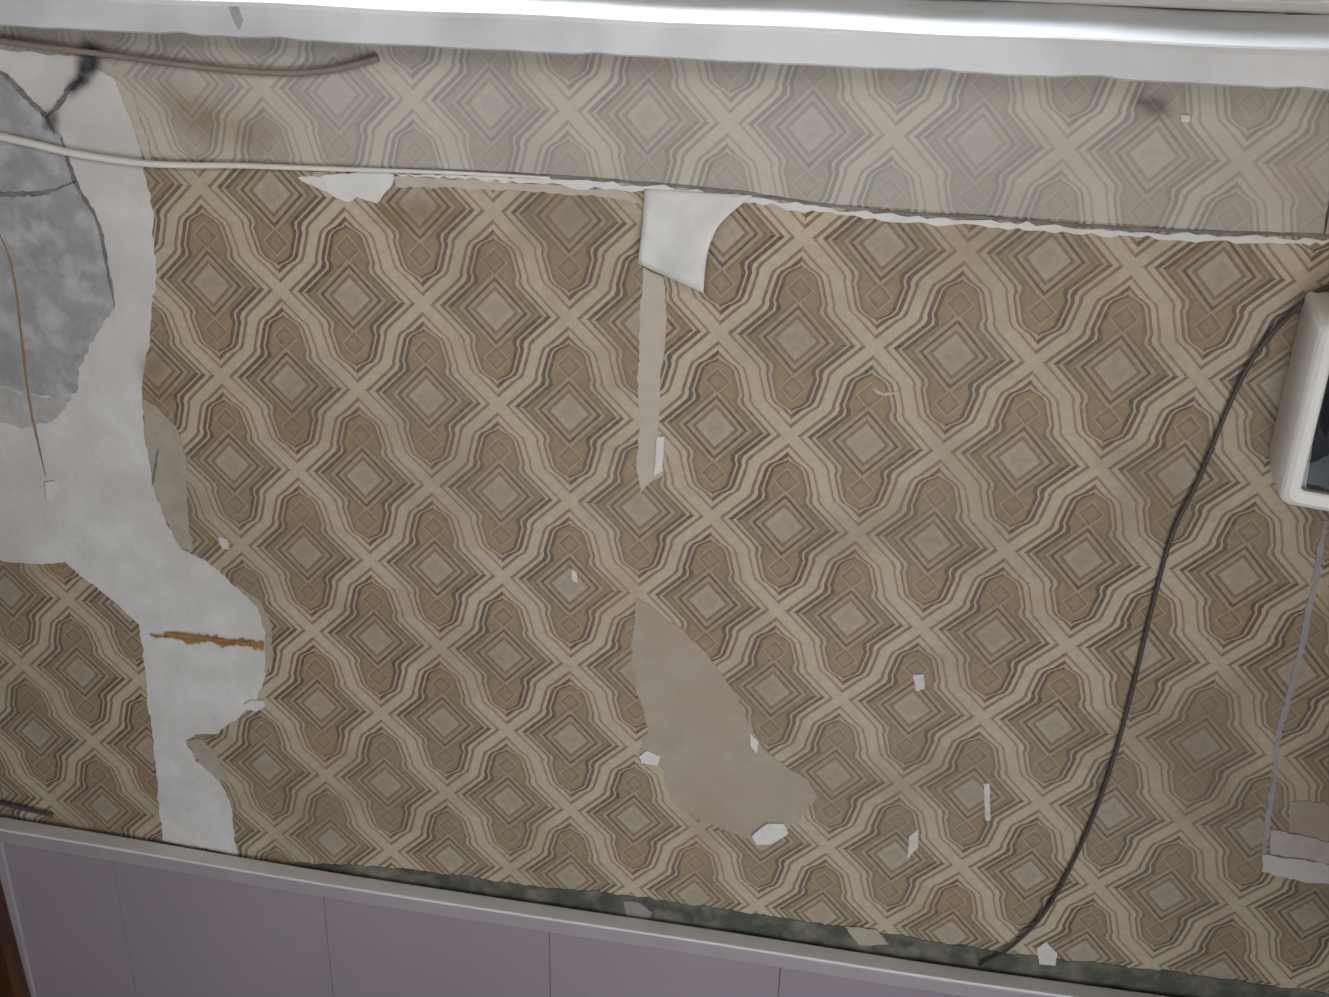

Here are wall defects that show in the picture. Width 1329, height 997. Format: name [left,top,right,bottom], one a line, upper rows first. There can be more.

spalling [0,75,115,429]
peeling [654,436,664,476]
rust [151,632,264,650]
peeling [245,699,265,711]
peeling [750,733,759,753]
peeling [639,750,660,766]
peeling [752,822,788,845]